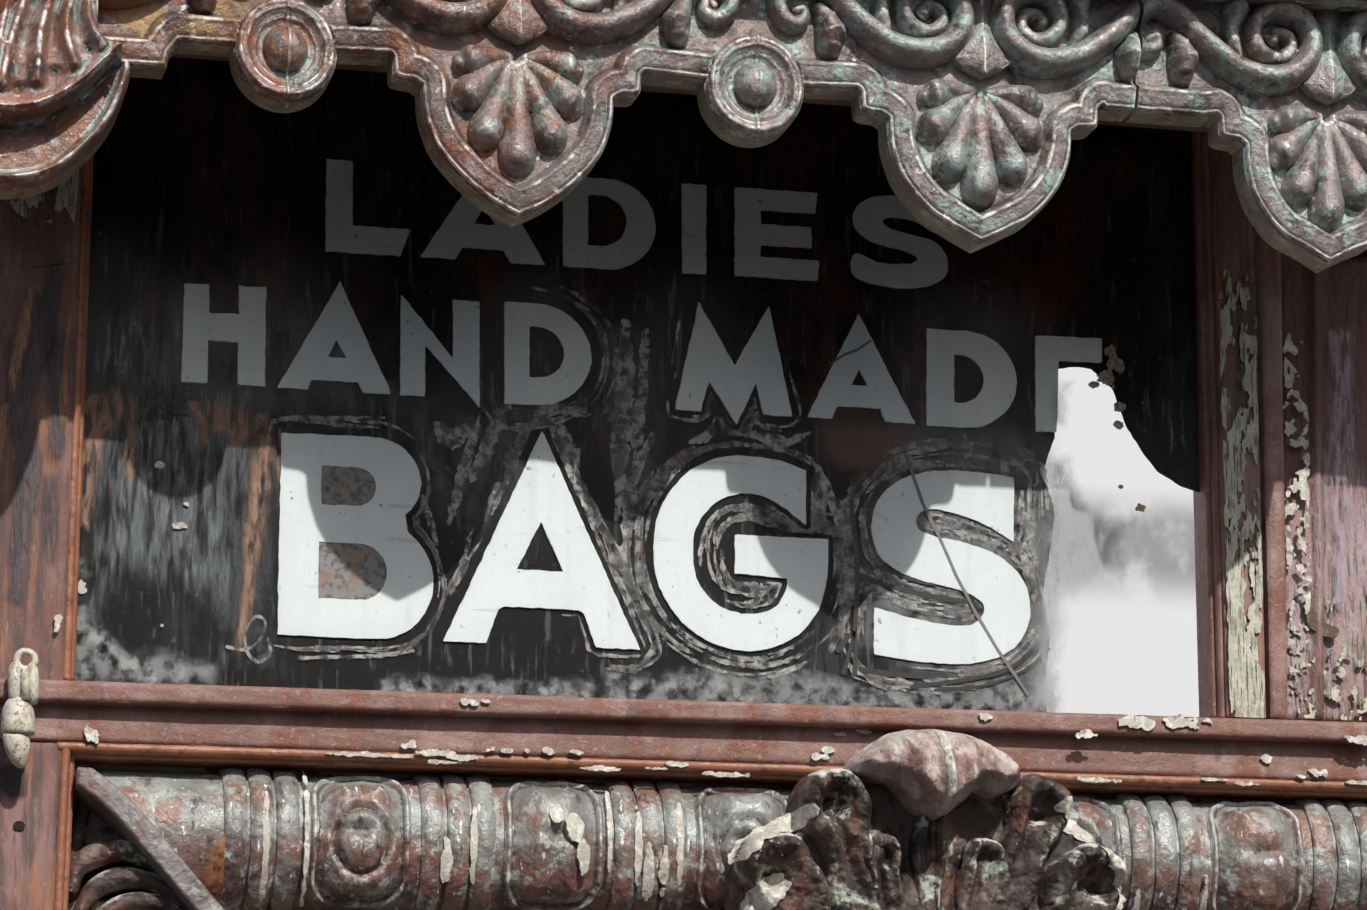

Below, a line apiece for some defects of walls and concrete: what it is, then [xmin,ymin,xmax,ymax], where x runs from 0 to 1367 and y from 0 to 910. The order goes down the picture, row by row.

peeling [1218,270,1266,718]
peeling [1282,333,1367,746]
peeling [325,740,621,772]
peeling [644,761,750,778]
peeling [1118,714,1213,731]
peeling [299,770,311,907]
peeling [440,806,478,884]
peeling [549,791,613,876]
peeling [634,802,685,901]
peeling [740,873,792,910]
peeling [727,803,820,865]
peeling [1054,777,1140,910]